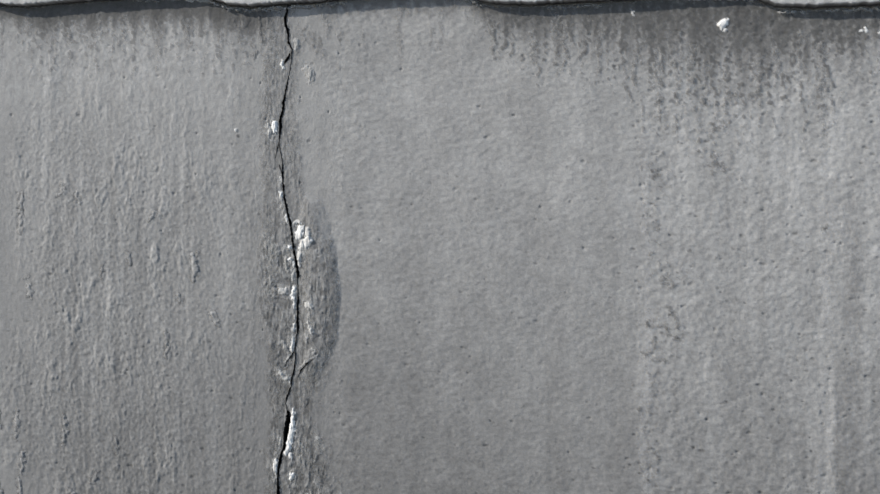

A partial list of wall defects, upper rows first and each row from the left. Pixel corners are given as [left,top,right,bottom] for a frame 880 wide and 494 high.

leakage [319,0,456,27]
leakage [468,0,880,157]
crack [263,4,324,494]